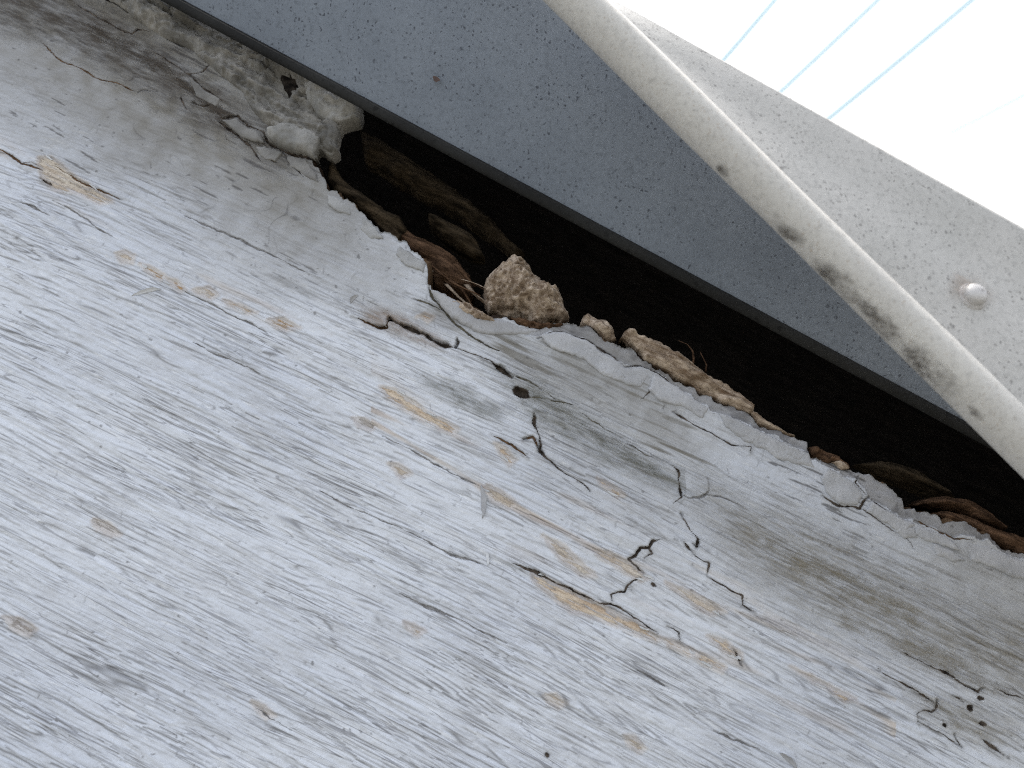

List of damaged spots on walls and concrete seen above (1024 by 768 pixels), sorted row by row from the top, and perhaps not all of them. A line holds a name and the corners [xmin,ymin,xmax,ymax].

peeling [190,77,219,106]
peeling [222,118,318,182]
peeling [328,195,383,239]
peeling [383,388,454,432]
crack [358,289,648,490]
hole [512,387,530,399]
crack [676,414,751,451]
peeling [541,332,1024,579]
peeling [481,485,513,518]
crack [674,467,750,610]
crack [513,539,680,634]
crack [882,653,1021,752]